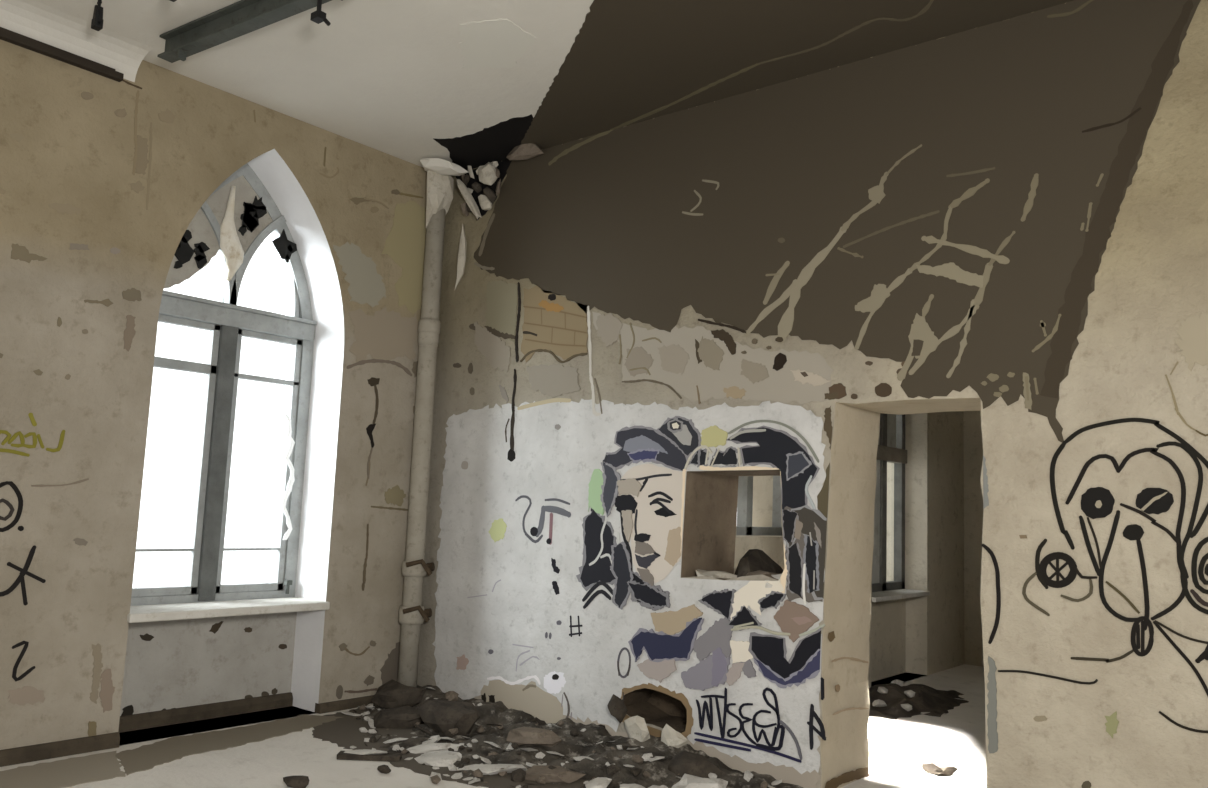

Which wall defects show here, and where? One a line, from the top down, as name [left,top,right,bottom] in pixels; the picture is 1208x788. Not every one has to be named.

spalling [420,114,858,568]
spalling [875,361,909,397]
spalling [620,683,694,738]